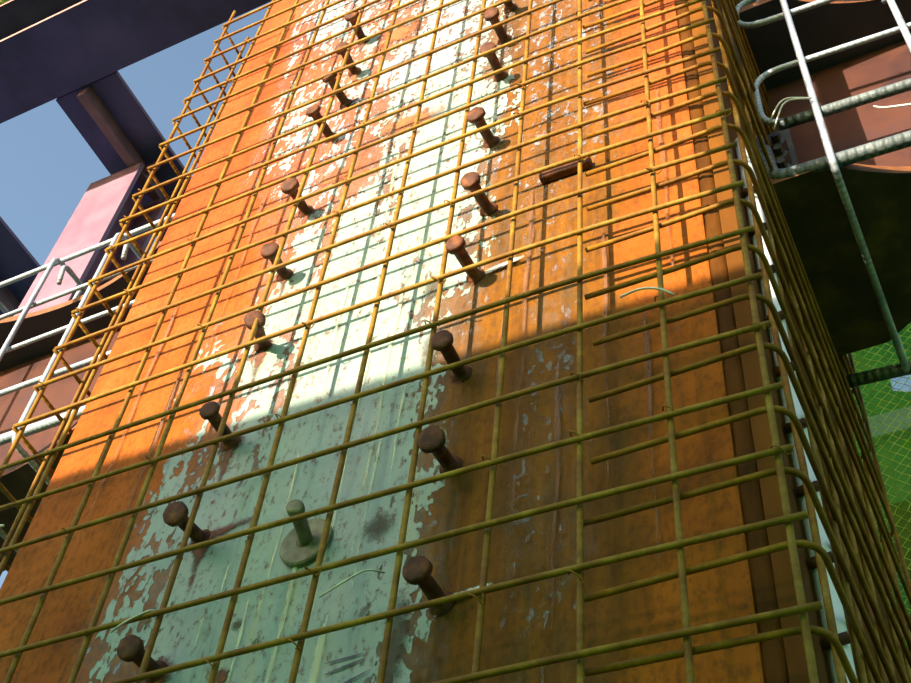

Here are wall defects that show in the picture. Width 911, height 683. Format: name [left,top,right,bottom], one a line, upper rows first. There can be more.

corrosion [656,91,669,230]
corrosion [523,195,533,331]
corrosion [124,307,177,432]
corrosion [250,341,273,389]
peeling [82,0,608,683]
corrosion [218,437,243,479]
corrosion [188,517,253,592]